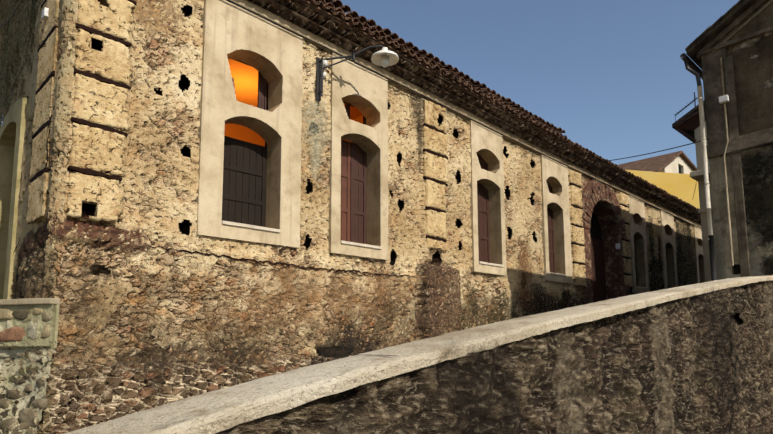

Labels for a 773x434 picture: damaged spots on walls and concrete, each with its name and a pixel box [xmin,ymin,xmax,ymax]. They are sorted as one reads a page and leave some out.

crack [43,115,52,172]
leakage [735,143,773,276]
crack [146,245,412,277]